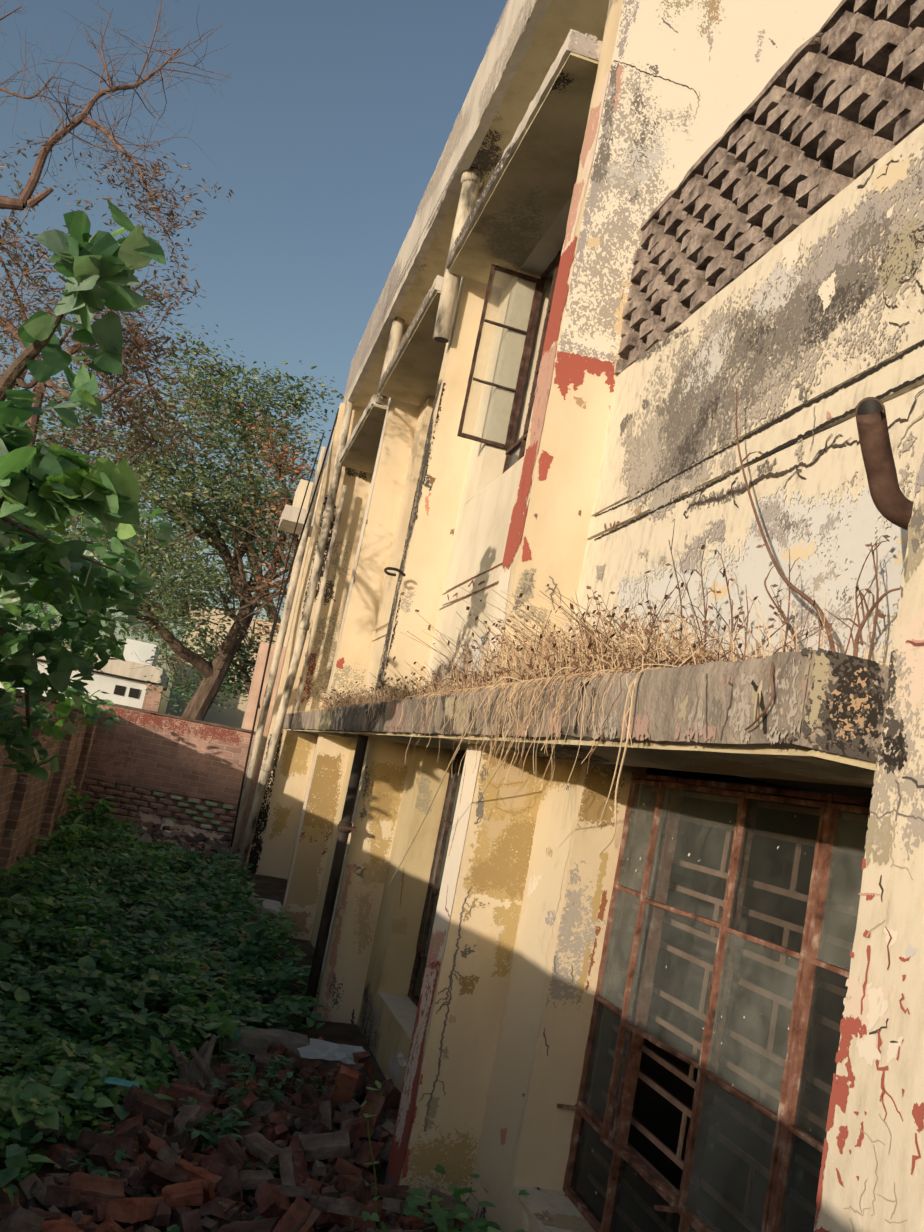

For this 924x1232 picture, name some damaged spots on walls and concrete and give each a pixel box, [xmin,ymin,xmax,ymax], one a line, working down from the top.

water stain [343,0,548,401]
peeling [871,156,912,194]
peeling [421,0,842,742]
water stain [559,0,924,866]
crack [591,225,924,541]
crack [905,639,924,647]
water stain [352,760,432,955]
crack [418,886,472,1132]
peeling [386,747,580,1185]
corrosion [585,890,608,990]
peeling [590,851,608,923]
peeling [814,928,917,1232]